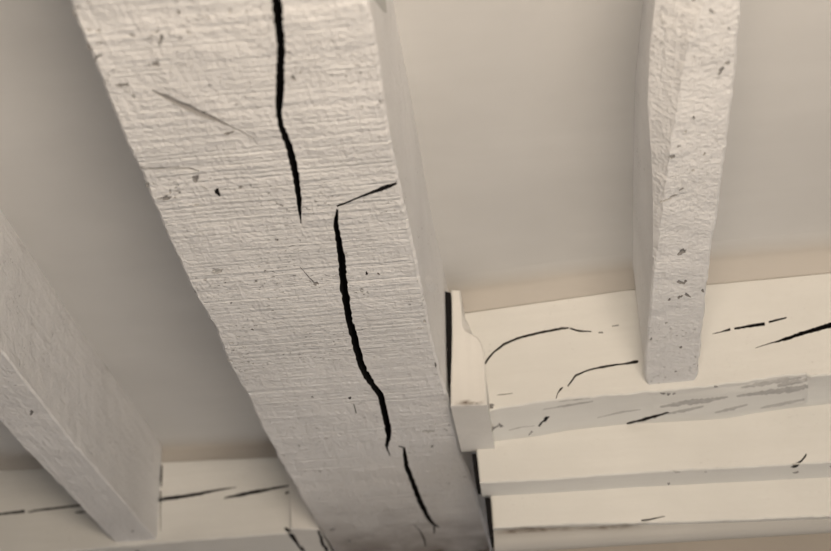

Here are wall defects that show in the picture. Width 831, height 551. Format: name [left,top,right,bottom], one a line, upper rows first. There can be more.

crack [271,0,302,223]
crack [485,325,619,364]
crack [712,317,831,348]
crack [333,181,439,548]
crack [556,360,638,399]
crack [0,504,86,515]
crack [159,485,289,502]